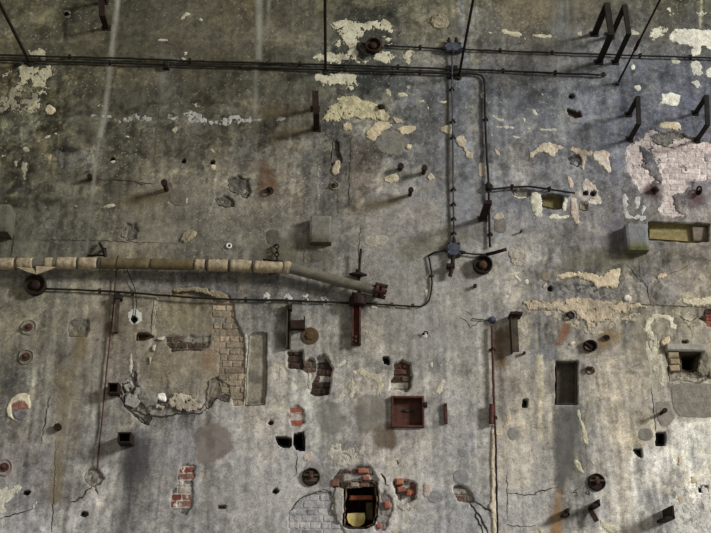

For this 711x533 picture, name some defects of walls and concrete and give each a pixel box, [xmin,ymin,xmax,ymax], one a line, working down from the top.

peeling [0,48,54,116]
peeling [313,18,415,95]
peeling [649,26,711,88]
peeling [392,117,416,135]
peeling [569,146,593,170]
flaking render [626,129,711,218]
flaking render [149,300,245,409]
flaking render [122,372,165,424]
flaking render [172,465,195,515]
flaking render [289,466,393,533]
crack [468,476,558,533]